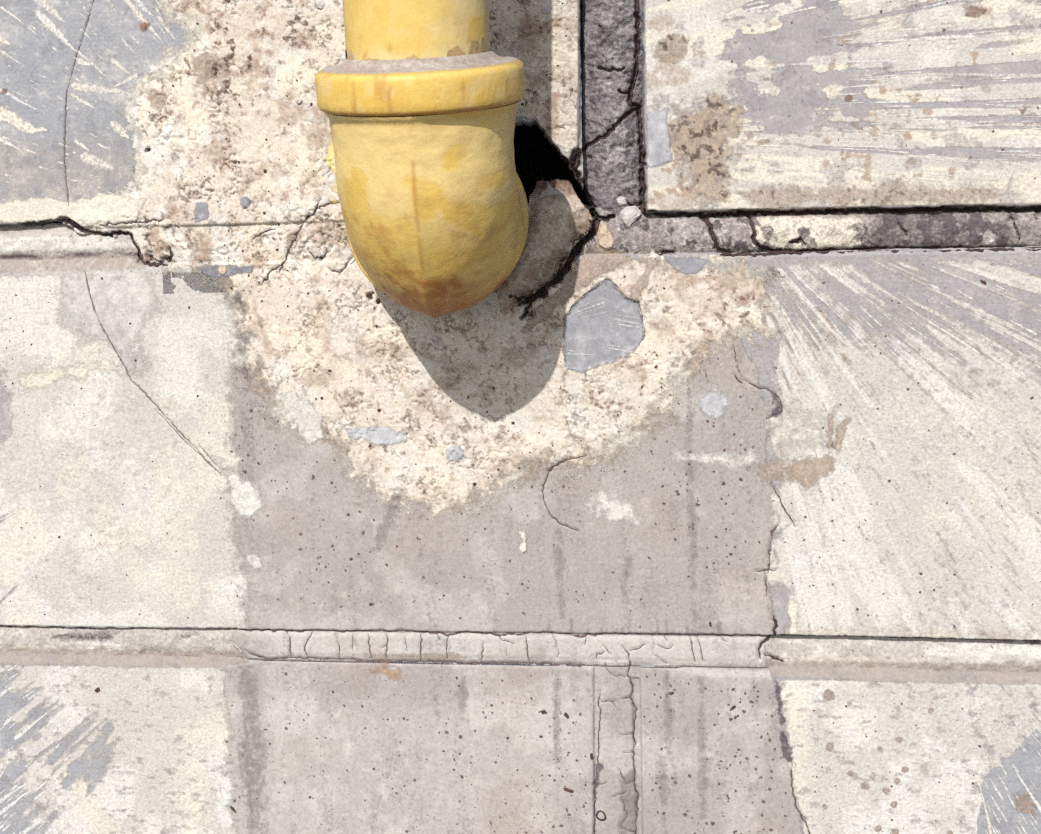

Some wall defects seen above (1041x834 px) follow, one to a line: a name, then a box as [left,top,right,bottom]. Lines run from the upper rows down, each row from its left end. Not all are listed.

peeling [447,38,487,57]
crack [22,0,173,266]
spalling [647,108,673,167]
crack [514,0,1041,319]
spalling [194,202,208,223]
spalling [198,265,252,277]
crack [251,201,355,283]
spalling [615,196,642,227]
spalling [563,278,645,373]
crack [542,455,587,531]
crack [214,484,821,834]
crack [859,634,1040,642]